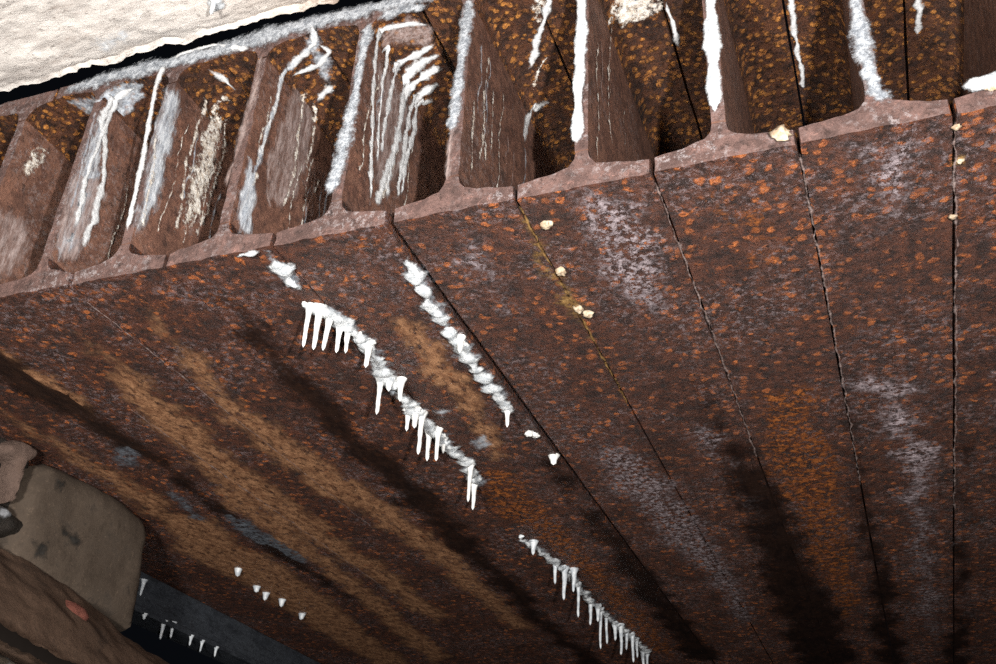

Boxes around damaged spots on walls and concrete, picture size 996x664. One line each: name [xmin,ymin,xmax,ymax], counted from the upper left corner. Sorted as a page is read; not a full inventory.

leakage [446,0,474,172]
leakage [529,0,552,86]
leakage [608,0,679,45]
leakage [788,0,804,87]
leakage [913,0,923,34]
leakage [965,71,996,91]
efflorescence [576,191,668,313]
rust [3,352,90,411]
rust [23,426,408,664]
rust [108,349,533,664]
rust [395,318,675,656]
rust [756,388,862,615]